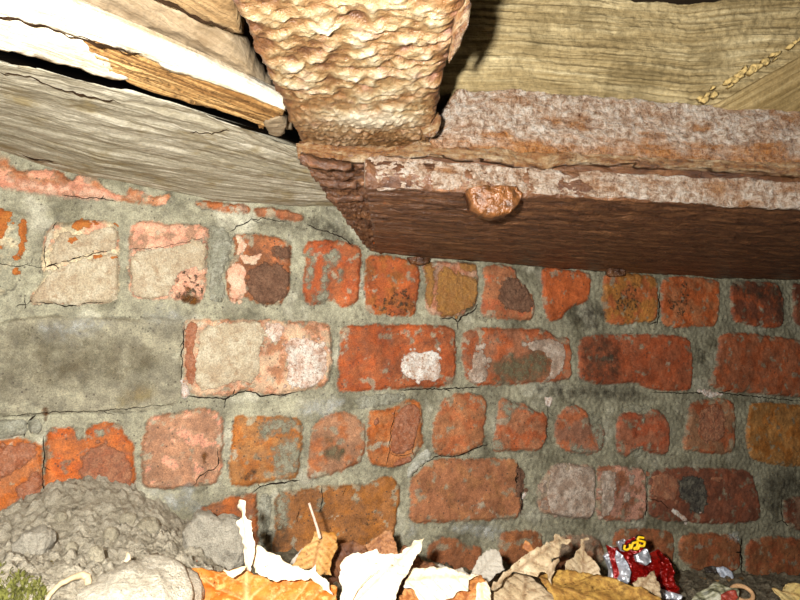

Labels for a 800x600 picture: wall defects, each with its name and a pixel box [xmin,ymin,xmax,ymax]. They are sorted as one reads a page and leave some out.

rust [420,112,441,137]
rust [300,152,364,203]
crack [0,223,112,269]
crack [178,329,186,378]
crack [190,389,295,408]
crack [4,404,168,489]
crack [386,409,486,476]